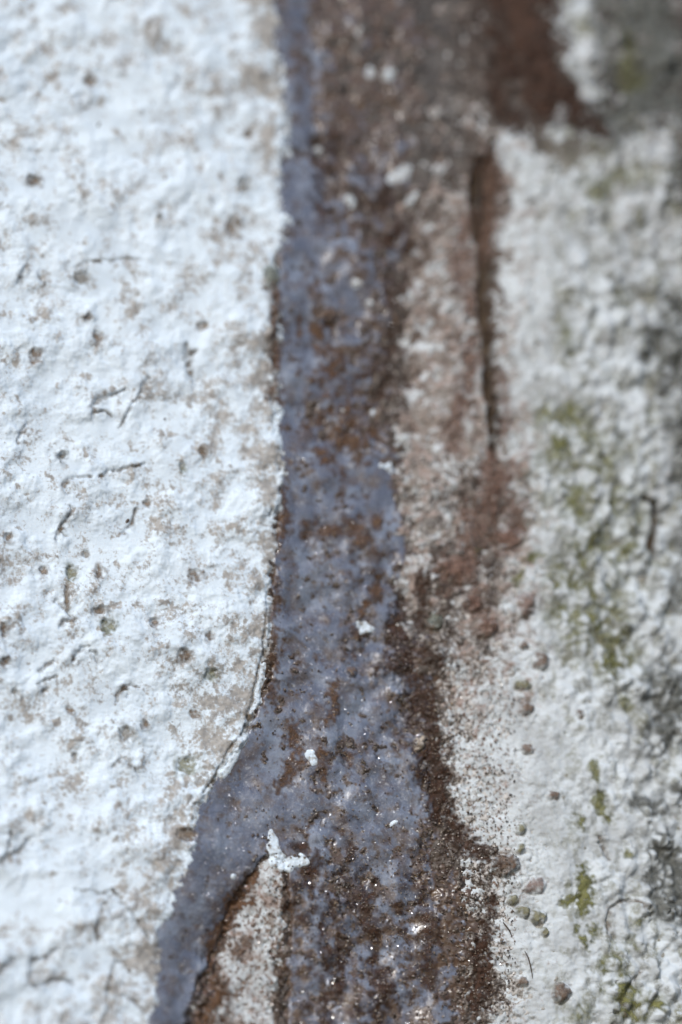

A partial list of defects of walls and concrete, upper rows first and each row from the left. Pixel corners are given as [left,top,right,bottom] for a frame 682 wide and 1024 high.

rust [474,0,610,138]
rust [381,217,426,265]
rust [450,336,481,448]
damp [512,552,545,587]
rust [375,447,527,866]
rust [282,828,396,1024]
rust [402,856,448,999]
rust [462,895,497,1024]